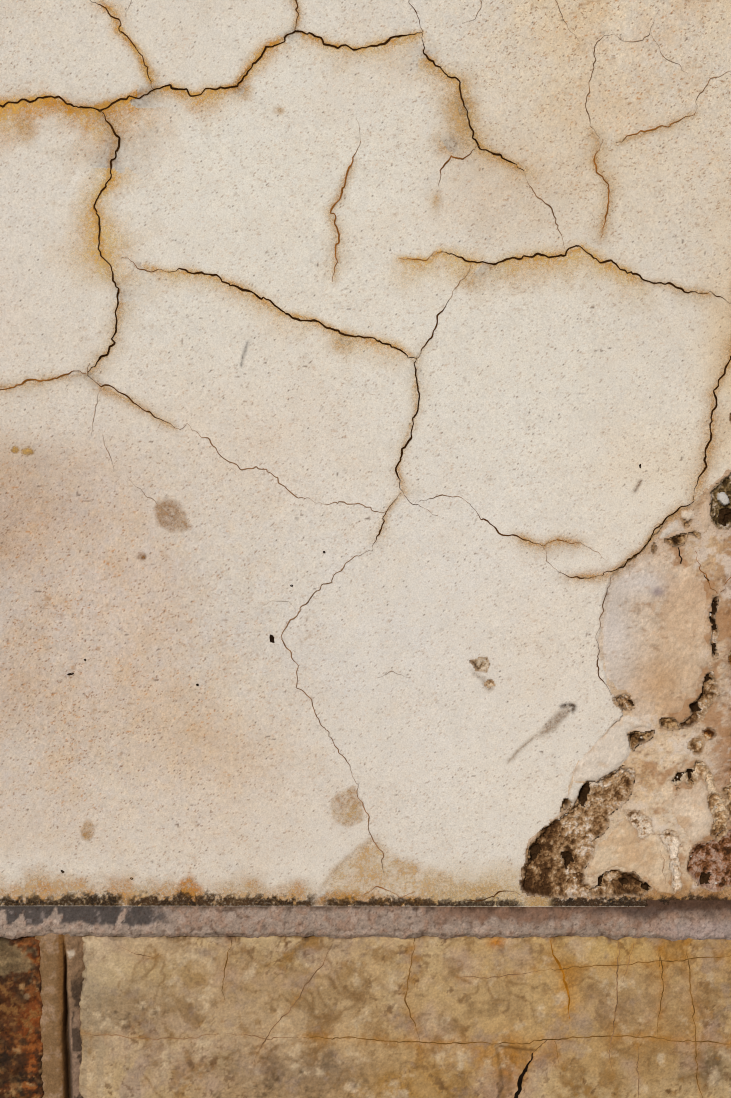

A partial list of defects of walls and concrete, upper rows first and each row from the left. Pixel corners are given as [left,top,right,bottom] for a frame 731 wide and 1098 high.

corrosion [104,6,283,106]
corrosion [0,91,138,129]
crack [0,0,731,869]
spalling [651,473,731,554]
spalling [519,595,731,900]
crack [459,891,517,902]
crack [86,938,729,1098]